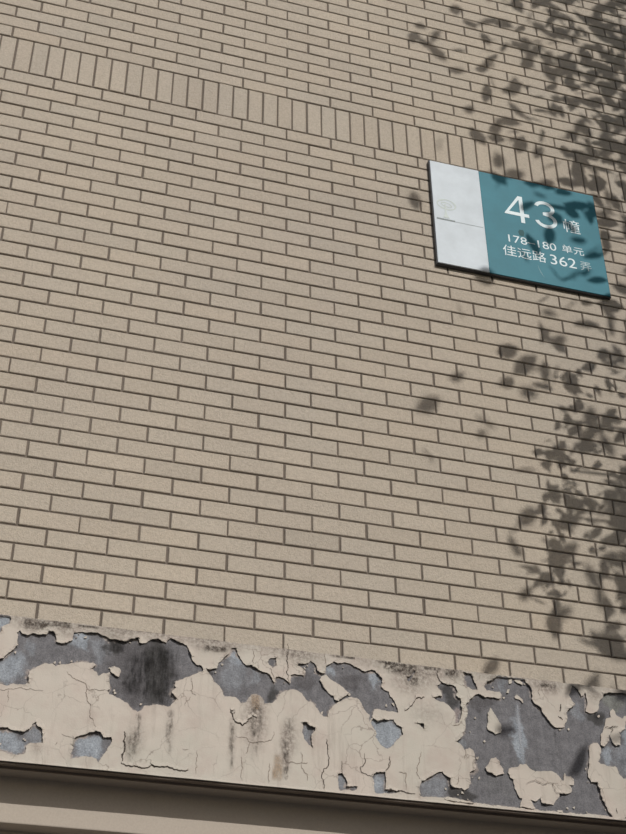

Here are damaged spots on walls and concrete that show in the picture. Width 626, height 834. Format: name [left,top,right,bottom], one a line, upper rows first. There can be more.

peeling [0,631,403,749]
crack [405,694,424,711]
peeling [0,723,43,755]
peeling [70,732,112,762]
crack [121,731,198,772]
crack [230,707,274,777]
crack [268,742,421,794]
peeling [338,774,357,791]
peeling [372,772,397,794]
peeling [419,673,626,817]